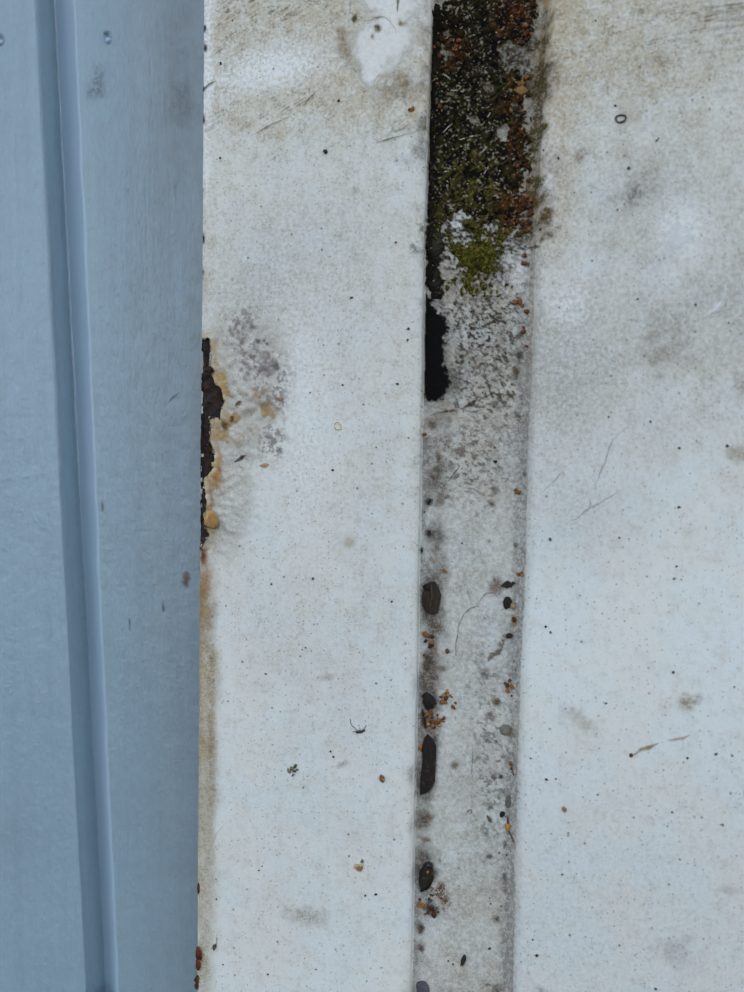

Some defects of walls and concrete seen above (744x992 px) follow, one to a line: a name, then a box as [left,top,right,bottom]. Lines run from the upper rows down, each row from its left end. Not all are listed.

water stain [424,0,539,401]
corrosion [194,946,202,990]